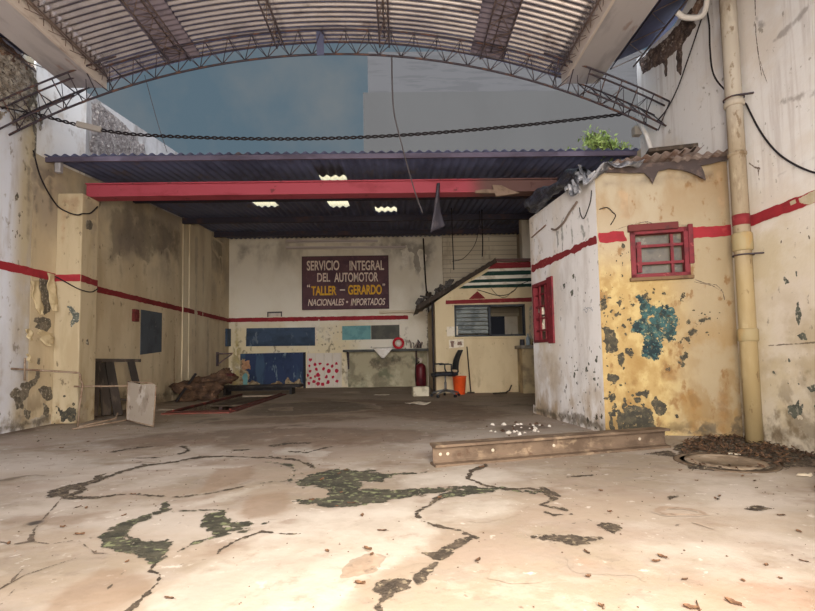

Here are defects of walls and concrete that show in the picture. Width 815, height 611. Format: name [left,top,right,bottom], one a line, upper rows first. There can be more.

flaking render [639,0,704,77]
flaking render [0,38,36,127]
flaking render [89,102,147,156]
flaking render [25,273,79,346]
spalling [10,353,77,424]
peeling [565,281,720,430]
damp [778,401,815,452]
crack [0,442,333,611]
crack [373,497,479,611]
crack [465,463,573,516]